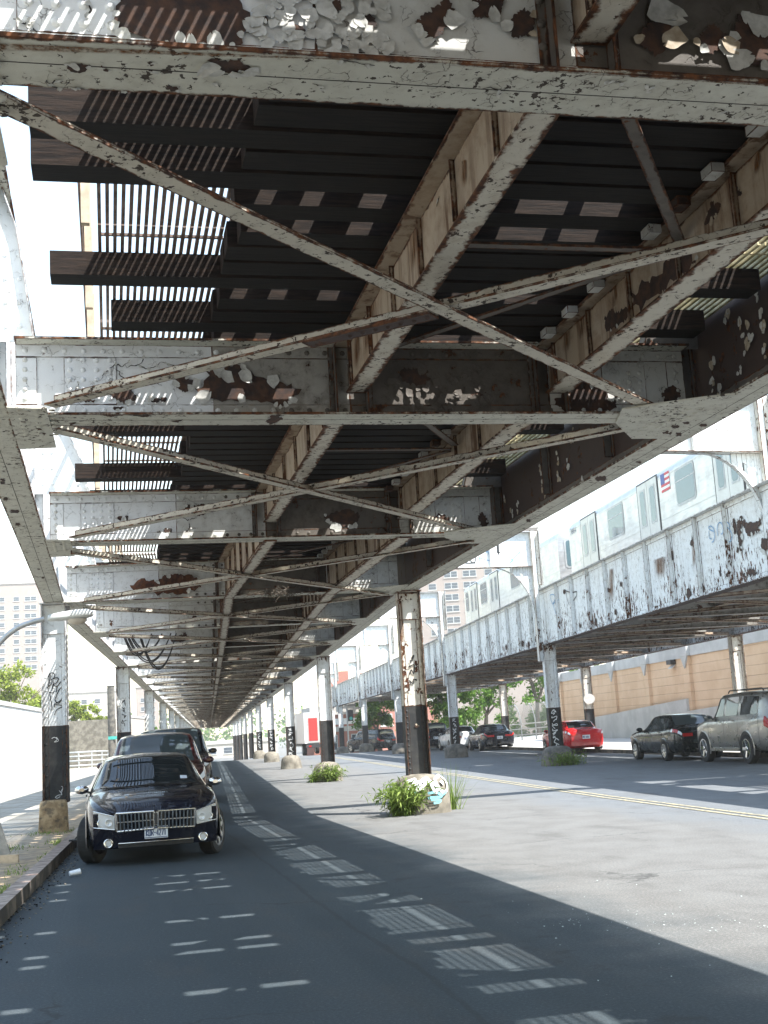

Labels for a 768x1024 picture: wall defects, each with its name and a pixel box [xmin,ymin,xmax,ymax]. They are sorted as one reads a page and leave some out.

rust [0,44,350,60]
peeling [197,58,260,78]
peeling [411,0,537,47]
peeling [633,0,768,70]
peeling [602,254,698,332]
peeling [723,292,767,376]
peeling [172,363,302,425]
peeling [387,362,500,412]
peeling [554,382,621,419]
peeling [709,356,722,395]
peeling [324,509,360,532]
peeling [130,573,201,596]